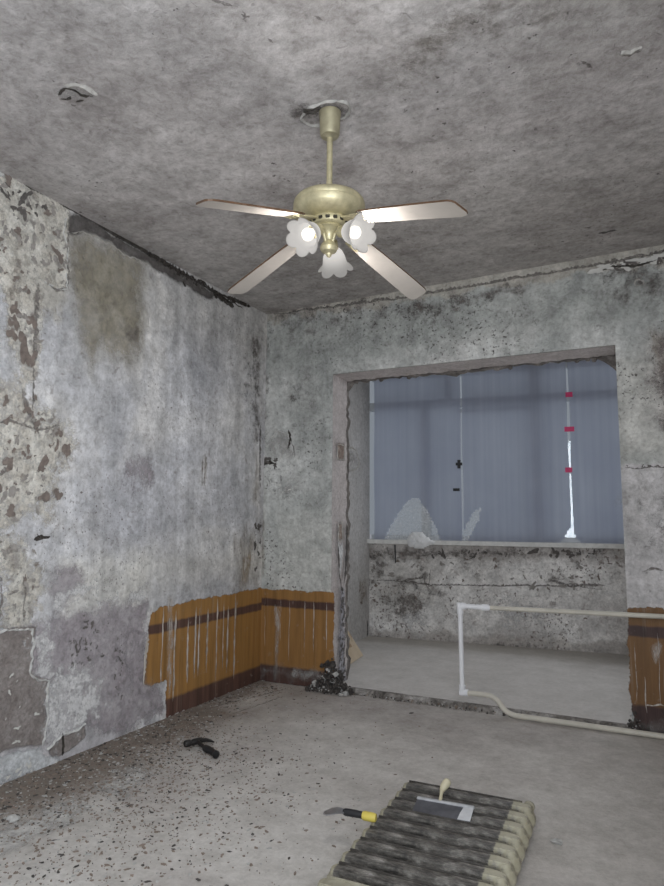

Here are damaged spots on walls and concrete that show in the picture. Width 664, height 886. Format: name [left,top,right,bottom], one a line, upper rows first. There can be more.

water stain [70,236,143,360]
peeling [0,174,214,763]